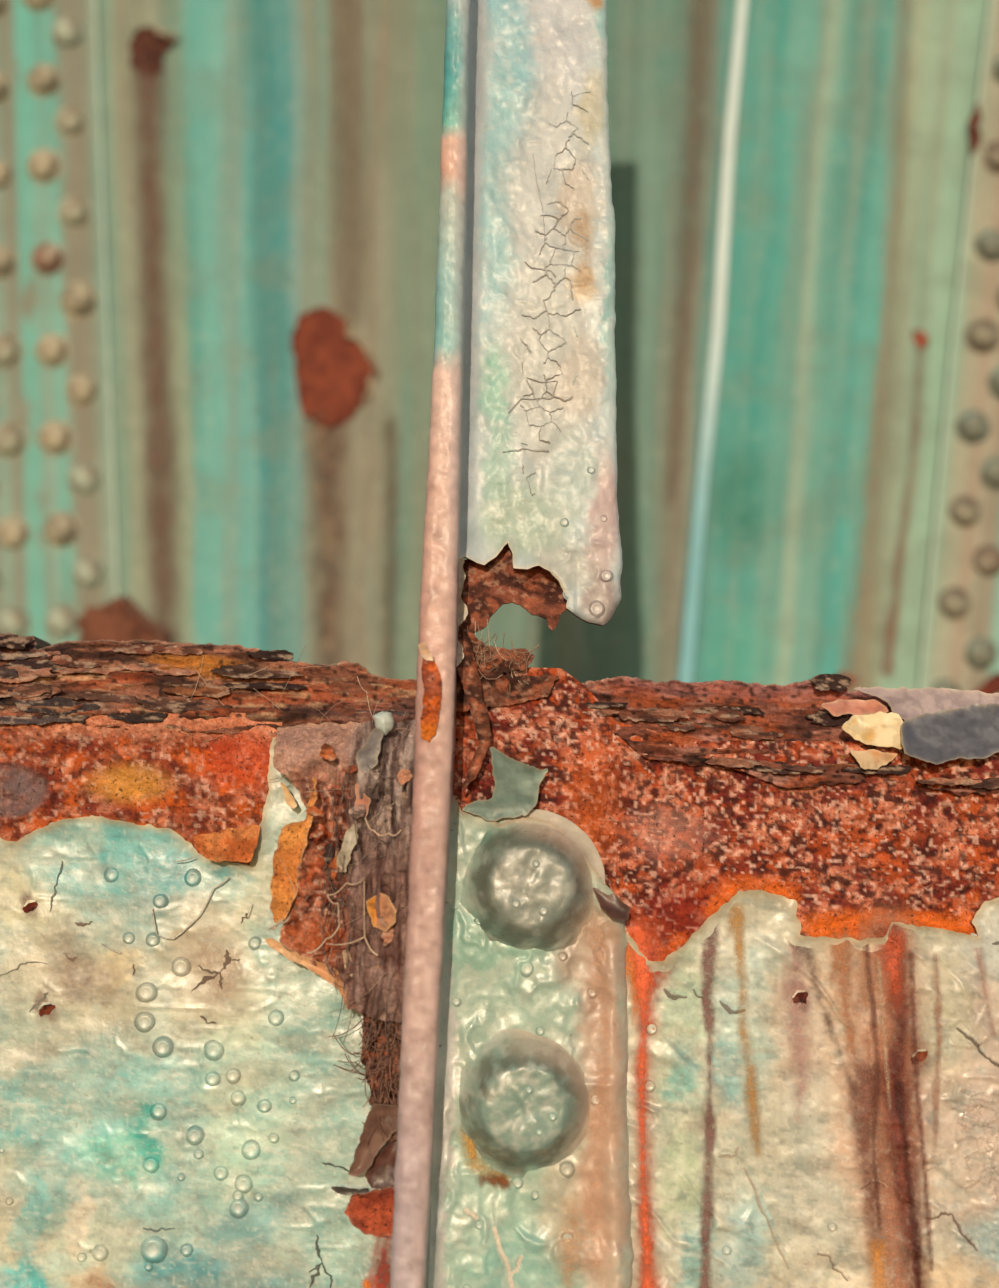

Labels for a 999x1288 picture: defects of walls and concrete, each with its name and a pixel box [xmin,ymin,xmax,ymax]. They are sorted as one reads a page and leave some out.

rust [0,62,442,856]
peeling [290,306,380,429]
crack [502,90,590,495]
peeling [77,595,170,642]
rust [883,492,909,675]
peeling [821,671,999,770]
peeling [194,825,260,863]
peeling [265,711,415,1238]
rust [453,545,999,1288]
rust [364,1236,392,1288]